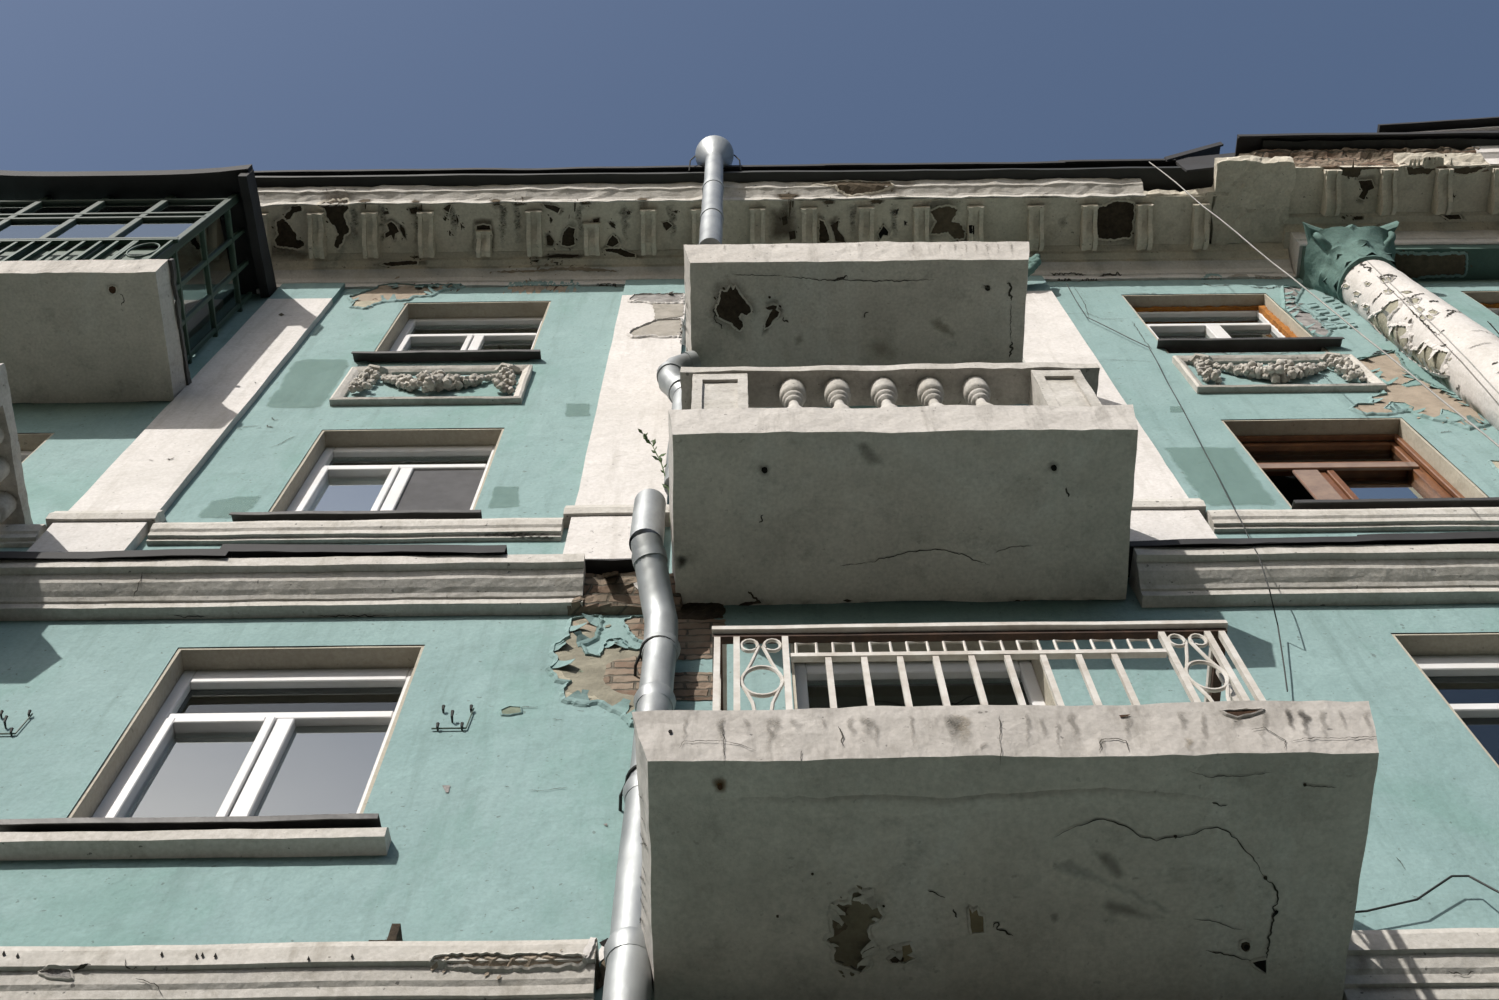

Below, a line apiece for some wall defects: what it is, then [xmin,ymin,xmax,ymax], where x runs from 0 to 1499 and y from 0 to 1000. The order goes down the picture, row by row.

spalling [271,193,422,254]
spalling [929,202,974,242]
spalling [1097,199,1136,242]
peeling [347,256,466,310]
spalling [713,283,789,332]
flaking render [1201,250,1492,433]
crack [842,545,1032,566]
flaking render [545,571,644,728]
peeling [499,706,527,717]
crack [1058,727,1376,975]
flaking render [822,885,917,978]
flaking render [929,891,1013,936]